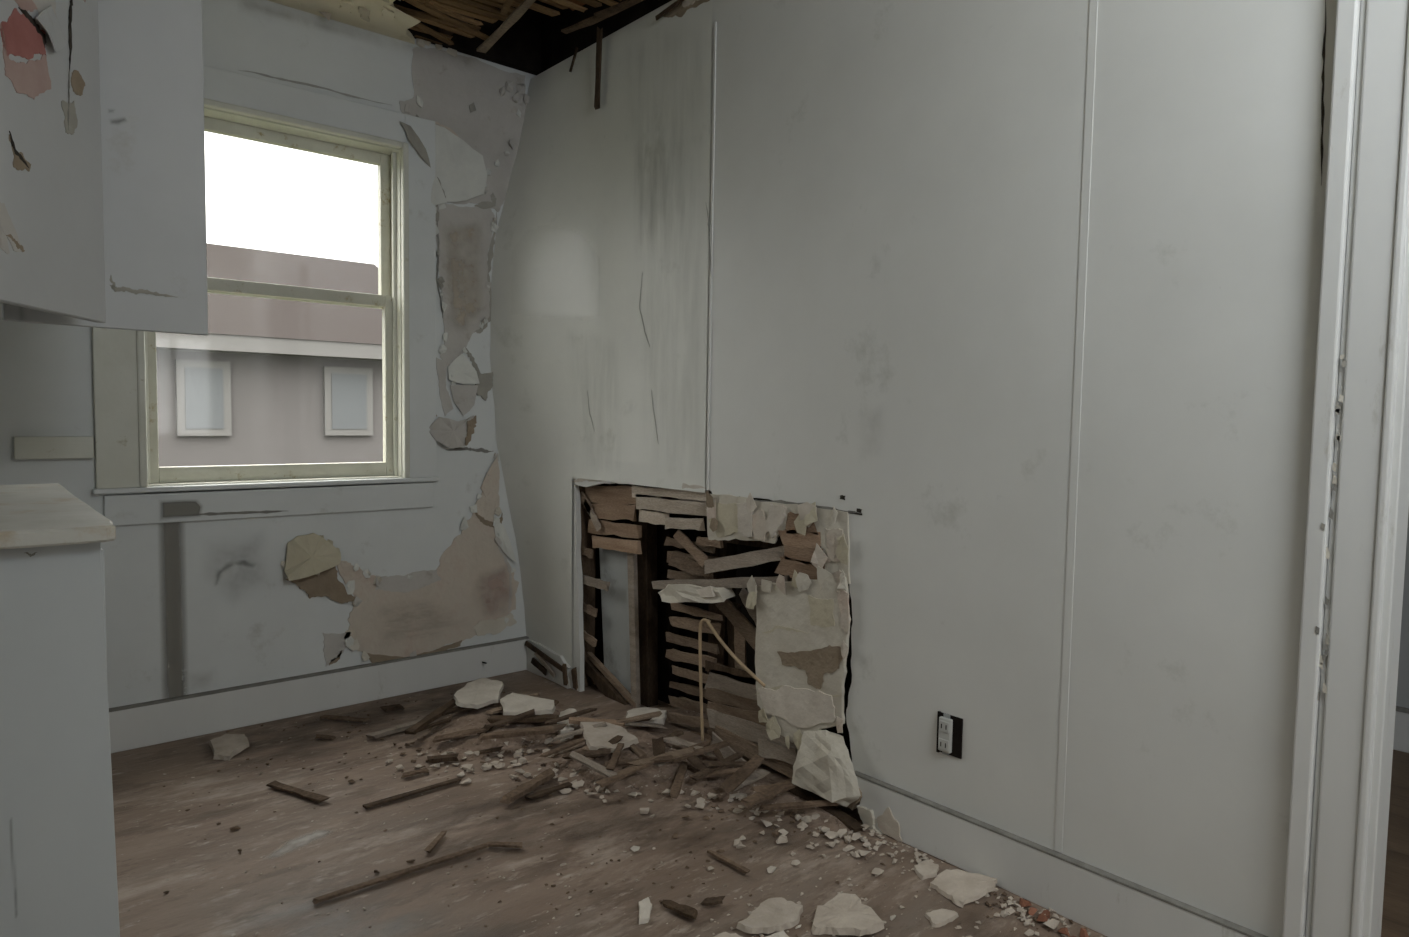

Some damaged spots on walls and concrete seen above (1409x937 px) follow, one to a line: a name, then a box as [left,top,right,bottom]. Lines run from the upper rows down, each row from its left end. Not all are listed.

crack [1319,0,1327,186]
flaking render [323,38,529,666]
spalling [572,478,902,842]